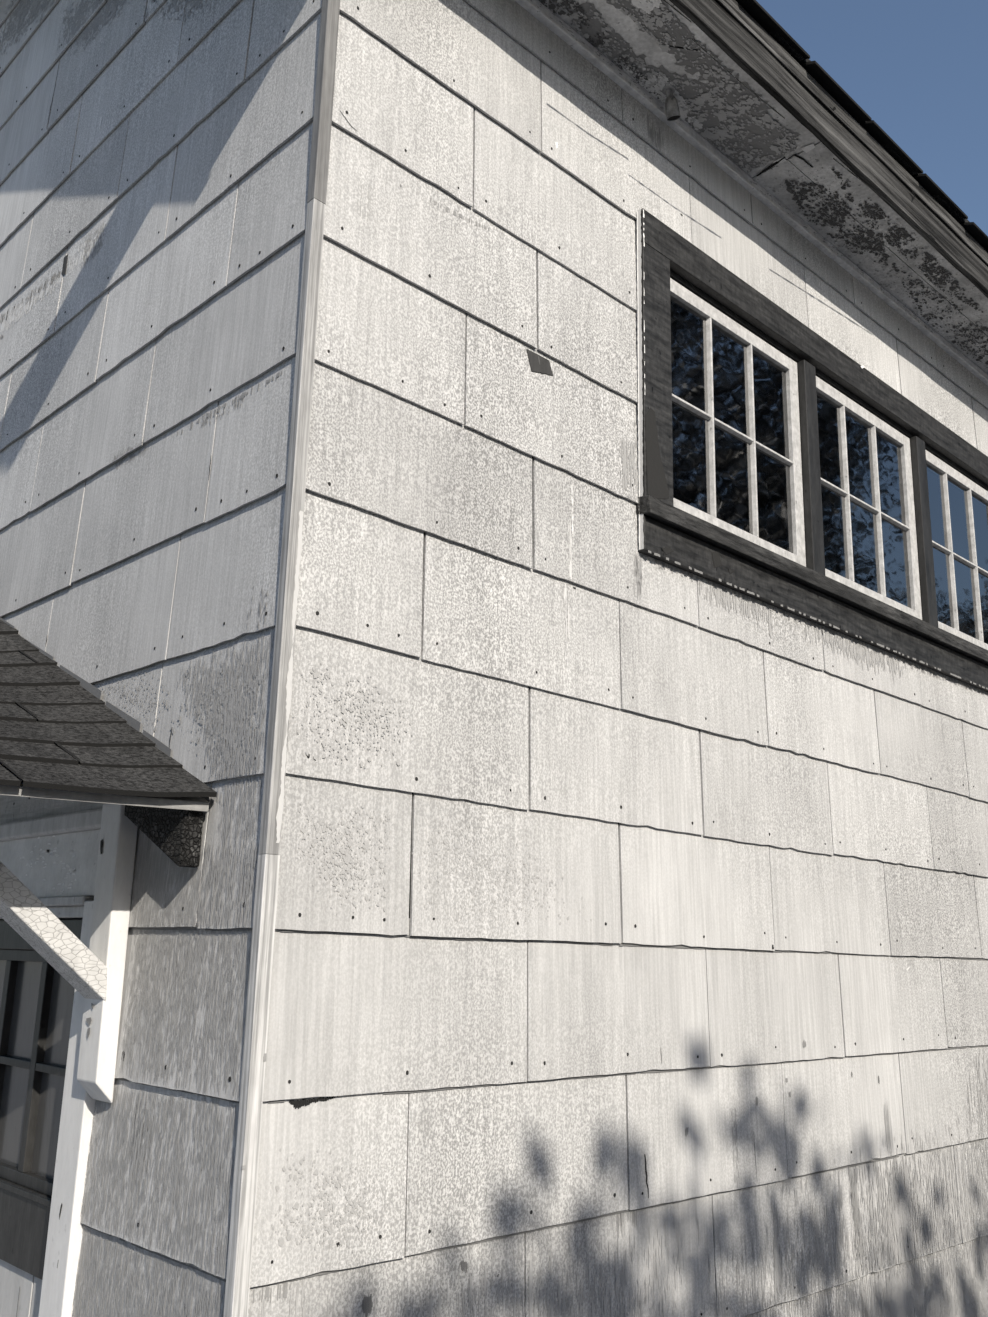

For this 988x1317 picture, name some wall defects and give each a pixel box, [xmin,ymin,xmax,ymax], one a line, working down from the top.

peeling [531,0,988,373]
peeling [636,210,645,496]
damp [869,1048,988,1317]